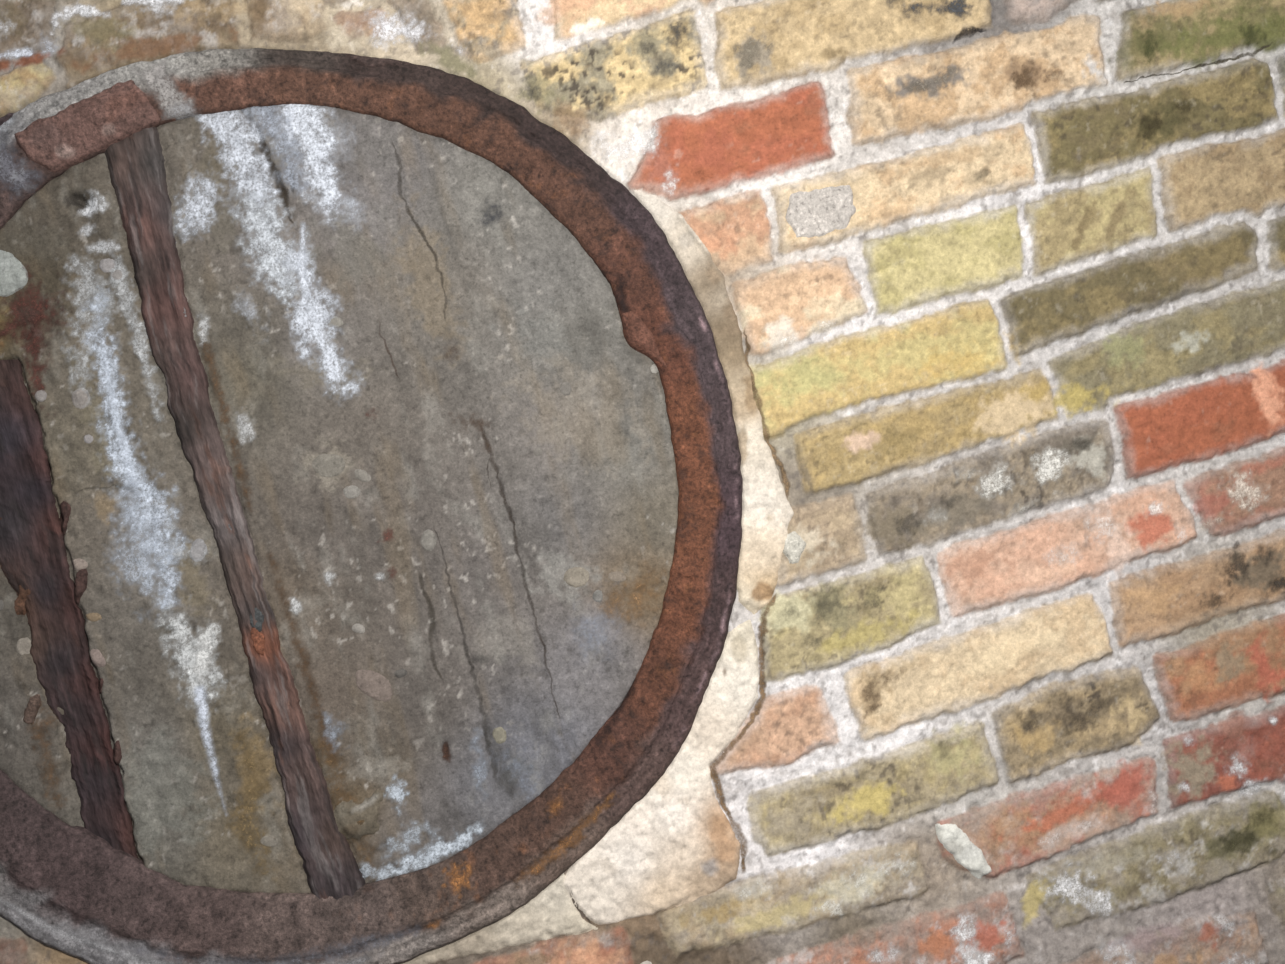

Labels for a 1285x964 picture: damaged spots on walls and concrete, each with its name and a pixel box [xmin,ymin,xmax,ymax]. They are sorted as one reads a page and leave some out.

damp [176,104,359,395]
crack [399,176,442,274]
corrosion [0,273,63,394]
damp [238,416,254,440]
corrosion [59,501,71,537]
damp [66,257,223,786]
crack [483,434,518,553]
corrosion [74,569,88,605]
corrosion [23,694,42,725]
corrosion [113,740,122,765]
damp [386,777,409,801]
damp [360,823,482,881]